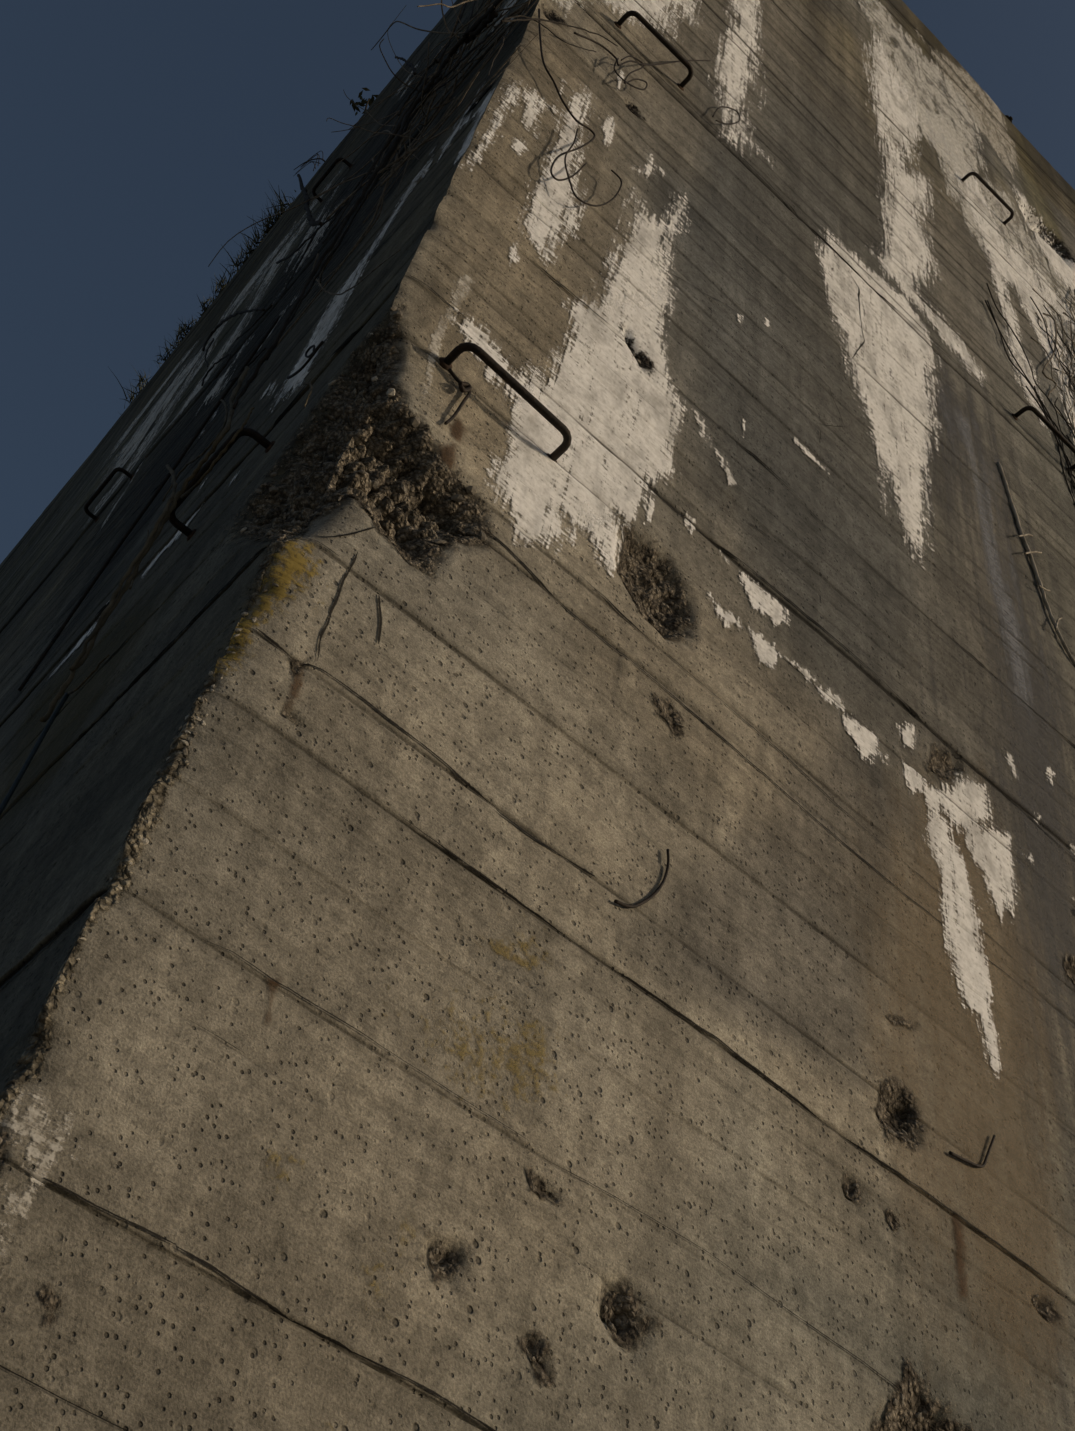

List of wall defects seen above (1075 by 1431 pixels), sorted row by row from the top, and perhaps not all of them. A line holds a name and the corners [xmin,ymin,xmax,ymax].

spalling [618,522,697,642]
spalling [0,306,497,1171]
spalling [876,1077,927,1152]
spalling [420,1229,469,1285]
spalling [599,1281,662,1352]
spalling [520,1330,556,1387]
spalling [870,1356,973,1431]